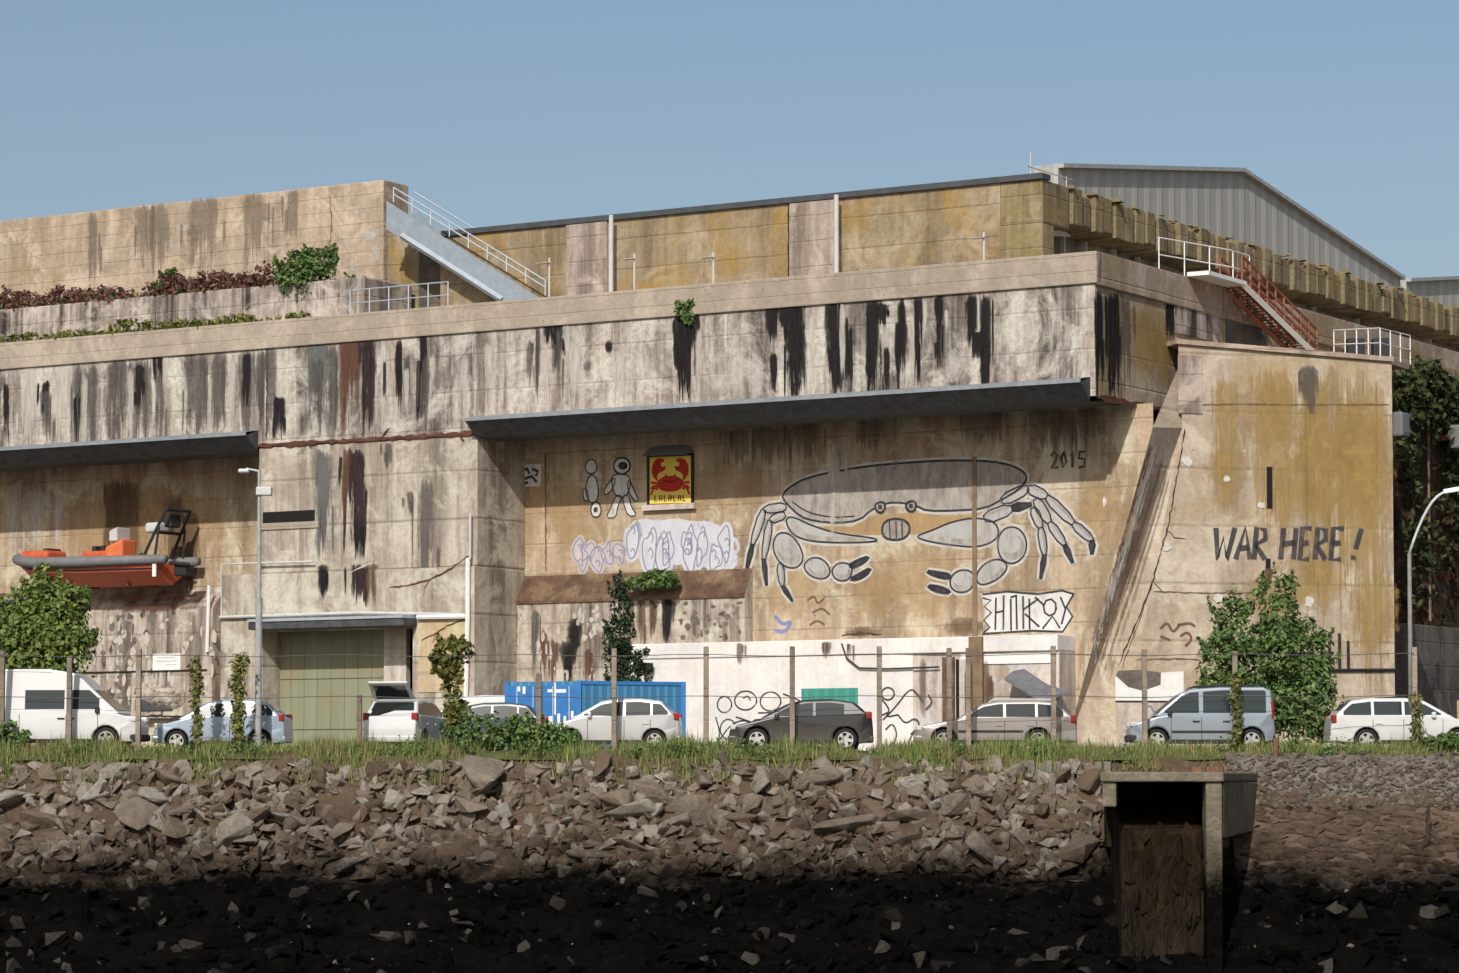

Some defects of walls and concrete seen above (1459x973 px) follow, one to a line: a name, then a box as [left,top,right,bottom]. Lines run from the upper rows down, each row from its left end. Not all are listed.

leakage [89,217,102,272]
leakage [245,192,297,253]
leakage [3,349,286,446]
leakage [305,344,338,432]
rust [339,342,360,529]
leakage [315,336,434,605]
leakage [672,295,994,403]
leakage [1032,291,1135,461]
leakage [402,480,440,568]
leakage [1255,367,1386,672]
leakage [516,612,541,672]
leakage [559,619,582,681]